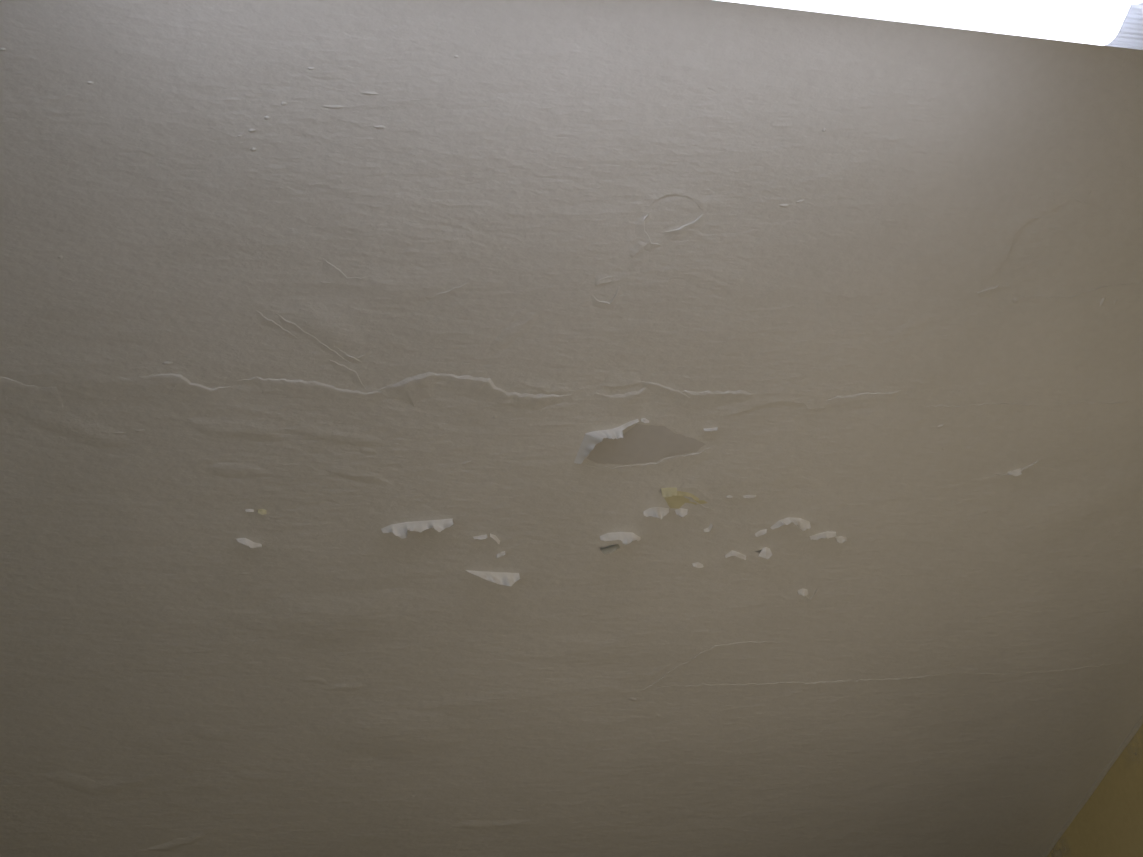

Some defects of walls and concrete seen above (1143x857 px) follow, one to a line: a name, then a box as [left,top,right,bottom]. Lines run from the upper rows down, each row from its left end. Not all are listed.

peeling [643,482,715,532]
peeling [236,538,262,548]
peeling [381,518,453,539]
peeling [600,532,641,555]
peeling [725,517,847,560]
peeling [466,570,520,586]